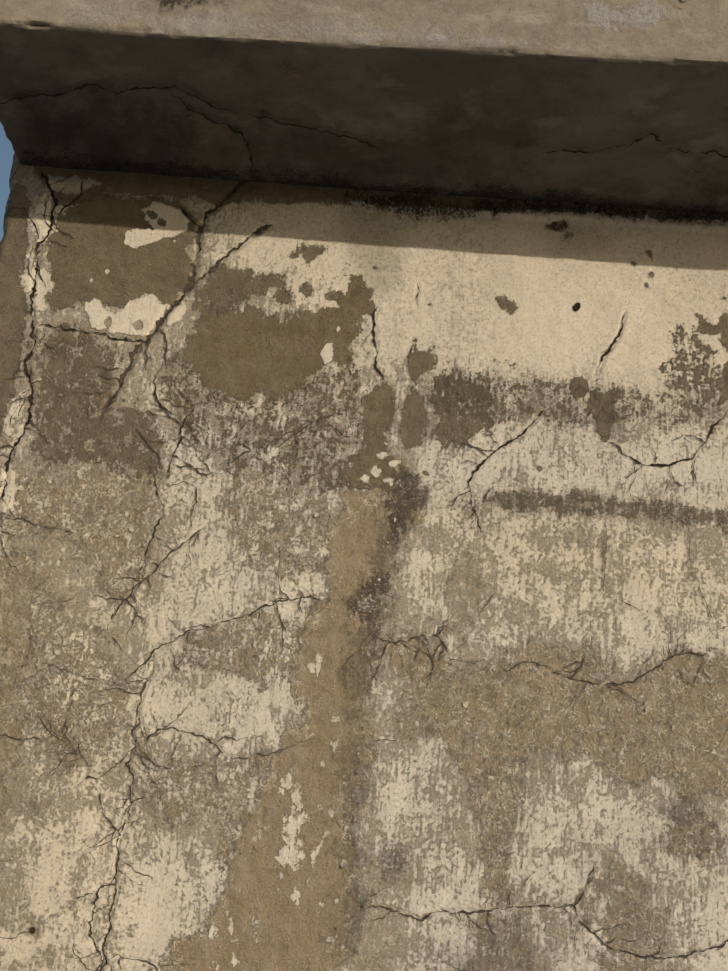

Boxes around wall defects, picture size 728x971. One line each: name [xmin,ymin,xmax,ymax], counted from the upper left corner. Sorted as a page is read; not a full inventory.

spalling [9,153,23,180]
peeling [0,547,141,828]
crack [0,83,384,971]
peeling [0,166,728,605]
peeling [122,261,728,971]
crack [434,410,546,534]
crack [342,515,728,713]
crack [600,414,726,519]
crack [360,862,728,968]